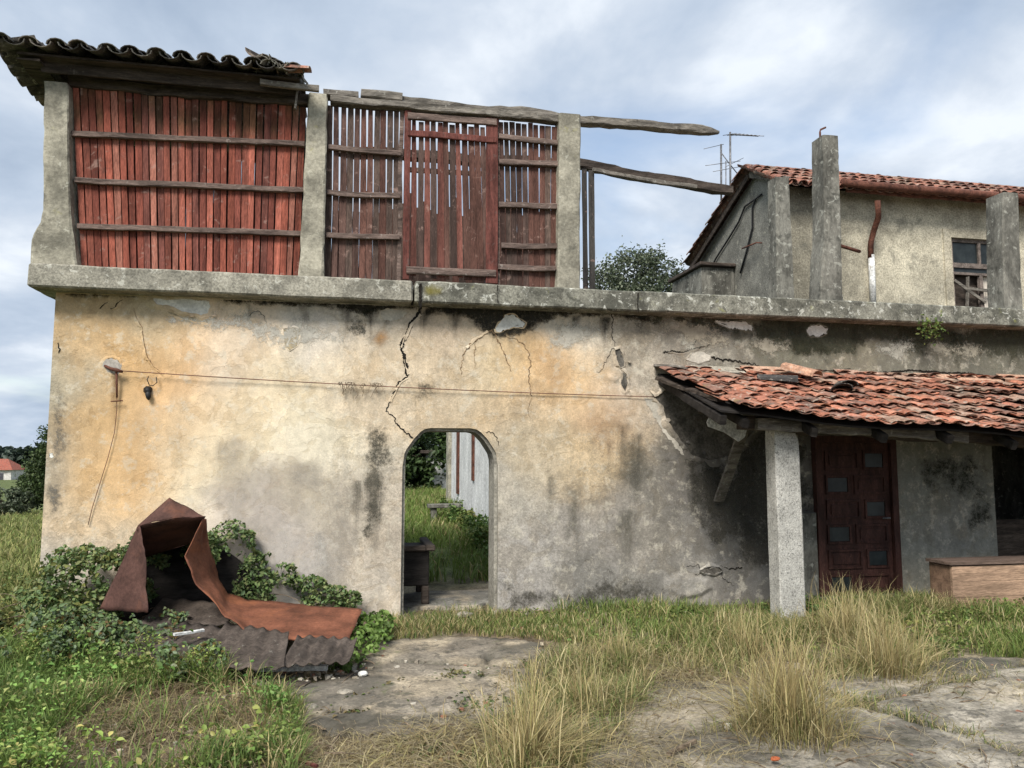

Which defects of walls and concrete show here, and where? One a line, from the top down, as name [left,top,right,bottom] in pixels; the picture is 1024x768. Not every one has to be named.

crack [385,283,422,438]
crack [460,329,532,416]
flaking render [494,313,527,333]
flaking render [806,323,828,338]
water stain [355,430,390,537]
water stain [922,458,991,528]
flaking render [699,562,723,577]